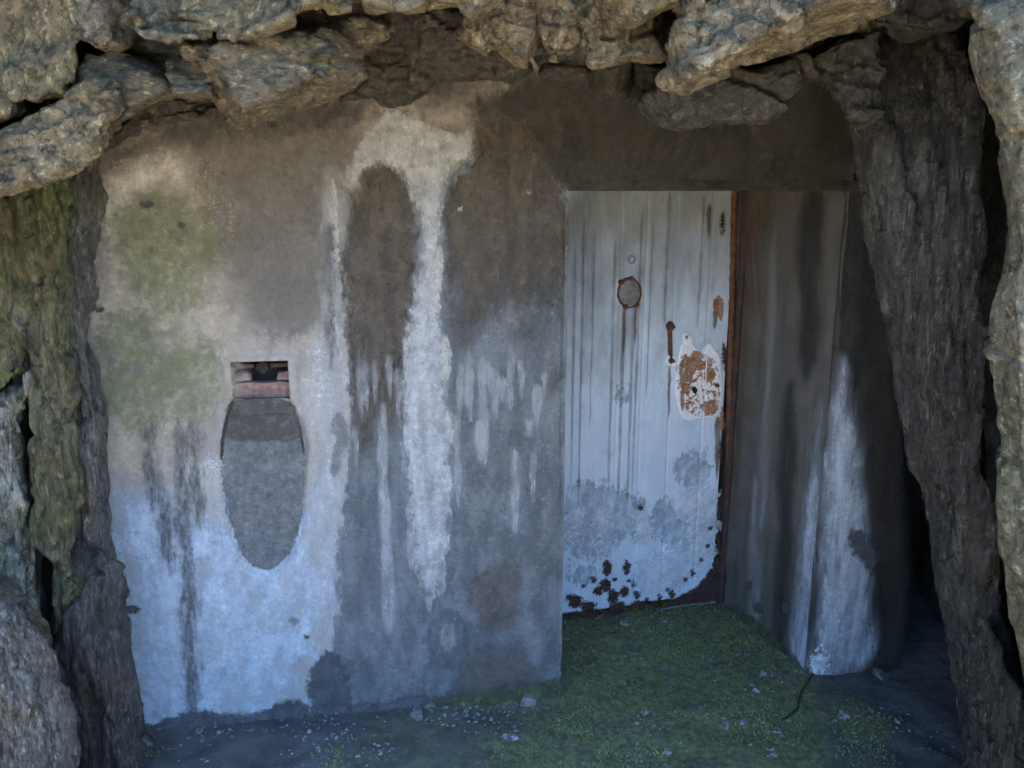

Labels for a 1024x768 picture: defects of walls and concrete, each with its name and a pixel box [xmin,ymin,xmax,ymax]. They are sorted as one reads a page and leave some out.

damp [90,71,907,710]
corrosion [622,303,640,353]
corrosion [668,191,738,477]